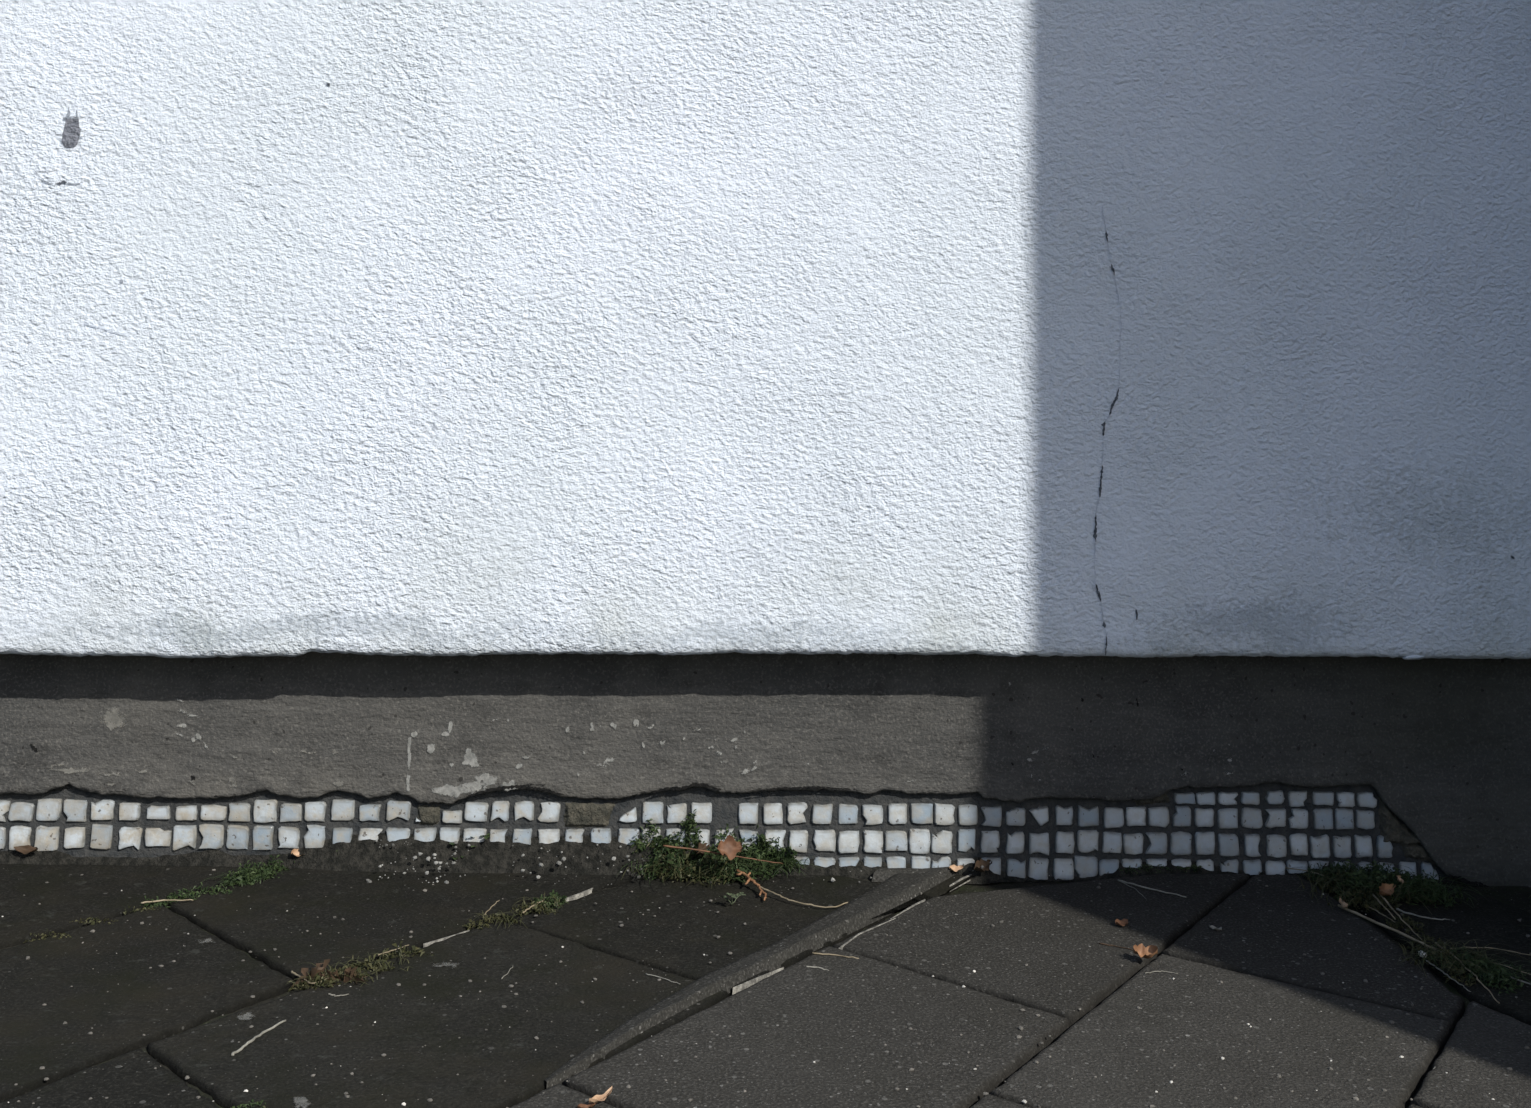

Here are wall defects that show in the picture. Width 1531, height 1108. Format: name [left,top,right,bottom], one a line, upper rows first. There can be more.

crack [1090,206,1138,656]
spalling [564,801,615,828]
spalling [1378,796,1437,866]